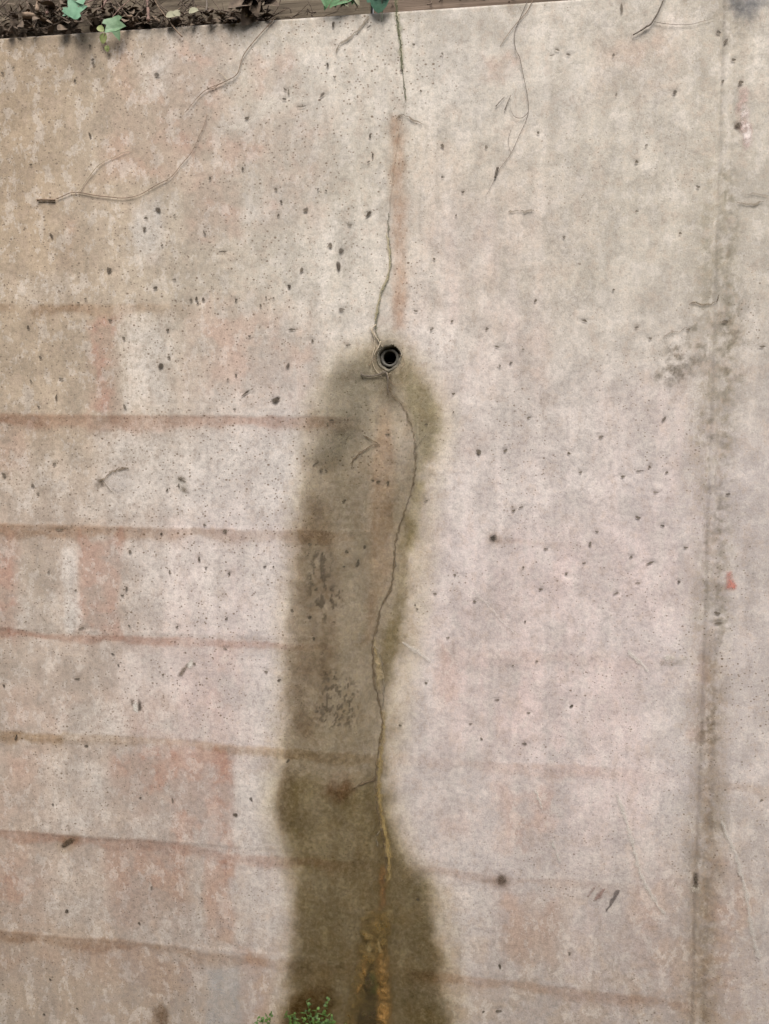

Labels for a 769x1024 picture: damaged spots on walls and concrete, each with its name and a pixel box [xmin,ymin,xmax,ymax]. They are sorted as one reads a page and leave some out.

crack [395,0,422,124]
crack [375,213,392,342]
crack [351,373,424,902]
leakage [346,868,390,1024]